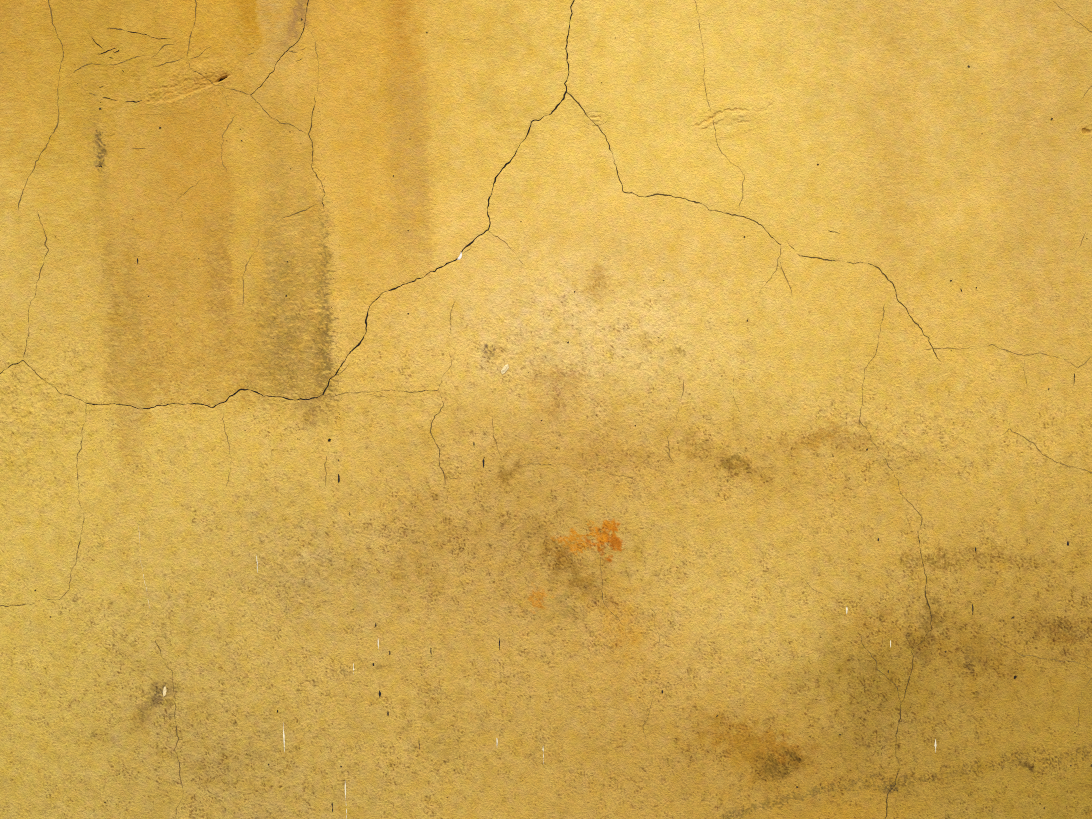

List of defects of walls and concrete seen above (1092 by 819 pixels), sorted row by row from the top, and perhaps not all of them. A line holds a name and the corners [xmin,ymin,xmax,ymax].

damp [68,0,349,575]
crack [0,0,1092,486]
crack [0,421,86,607]
damp [388,658,505,787]
damp [509,499,609,641]
corrosion [543,514,661,704]
damp [667,421,795,497]
damp [773,577,1092,788]